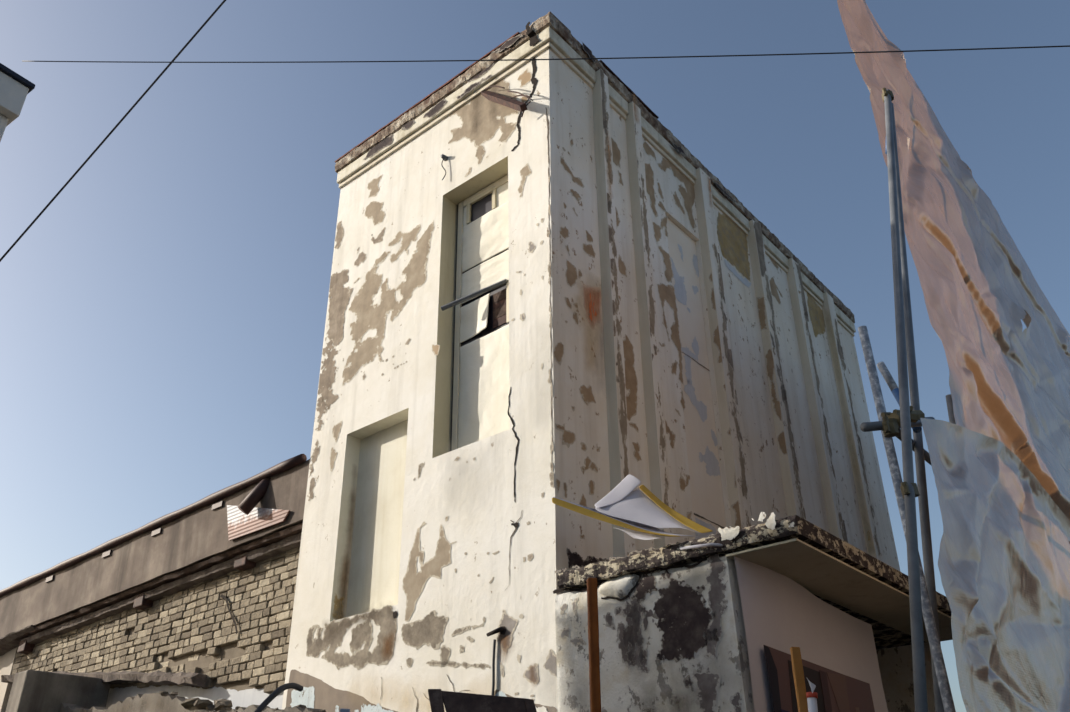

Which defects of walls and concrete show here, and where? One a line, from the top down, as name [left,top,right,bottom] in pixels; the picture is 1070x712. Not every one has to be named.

peeling [363,34,532,177]
peeling [307,175,434,501]
crack [511,22,554,487]
peeling [541,342,572,372]
peeling [600,68,641,478]
peeling [635,123,806,539]
spalling [151,691,240,712]
flaking render [264,669,398,712]
peeling [306,516,557,712]
crack [506,387,522,589]
spalling [567,548,608,568]
water stain [603,554,742,712]